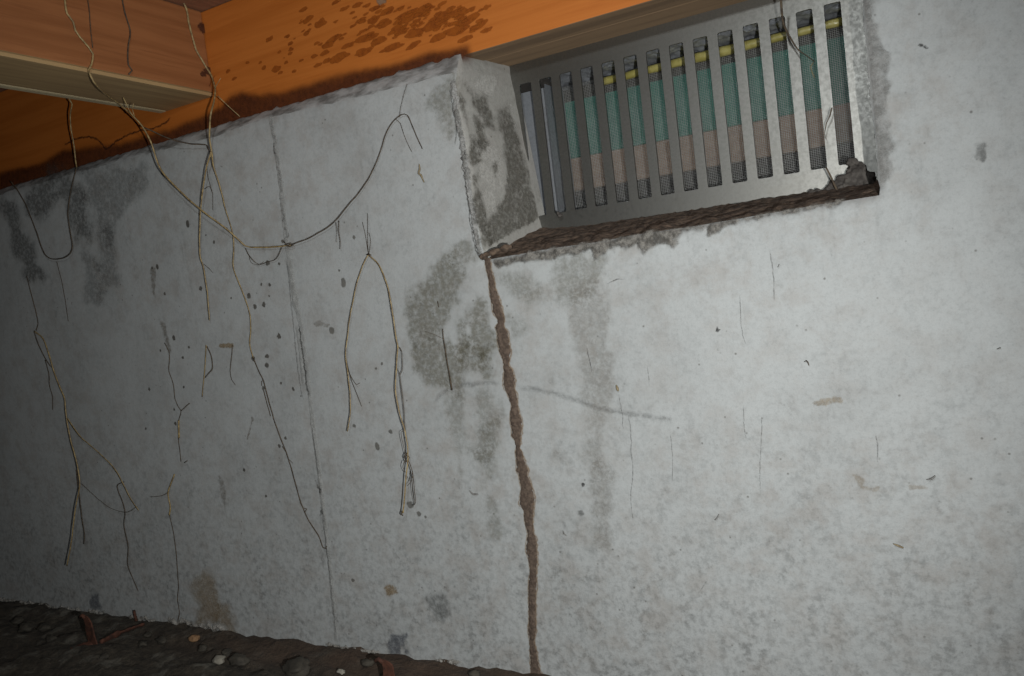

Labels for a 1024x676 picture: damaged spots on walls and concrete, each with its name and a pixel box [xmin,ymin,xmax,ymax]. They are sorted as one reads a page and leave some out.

damp [0,0,492,189]
damp [459,75,537,245]